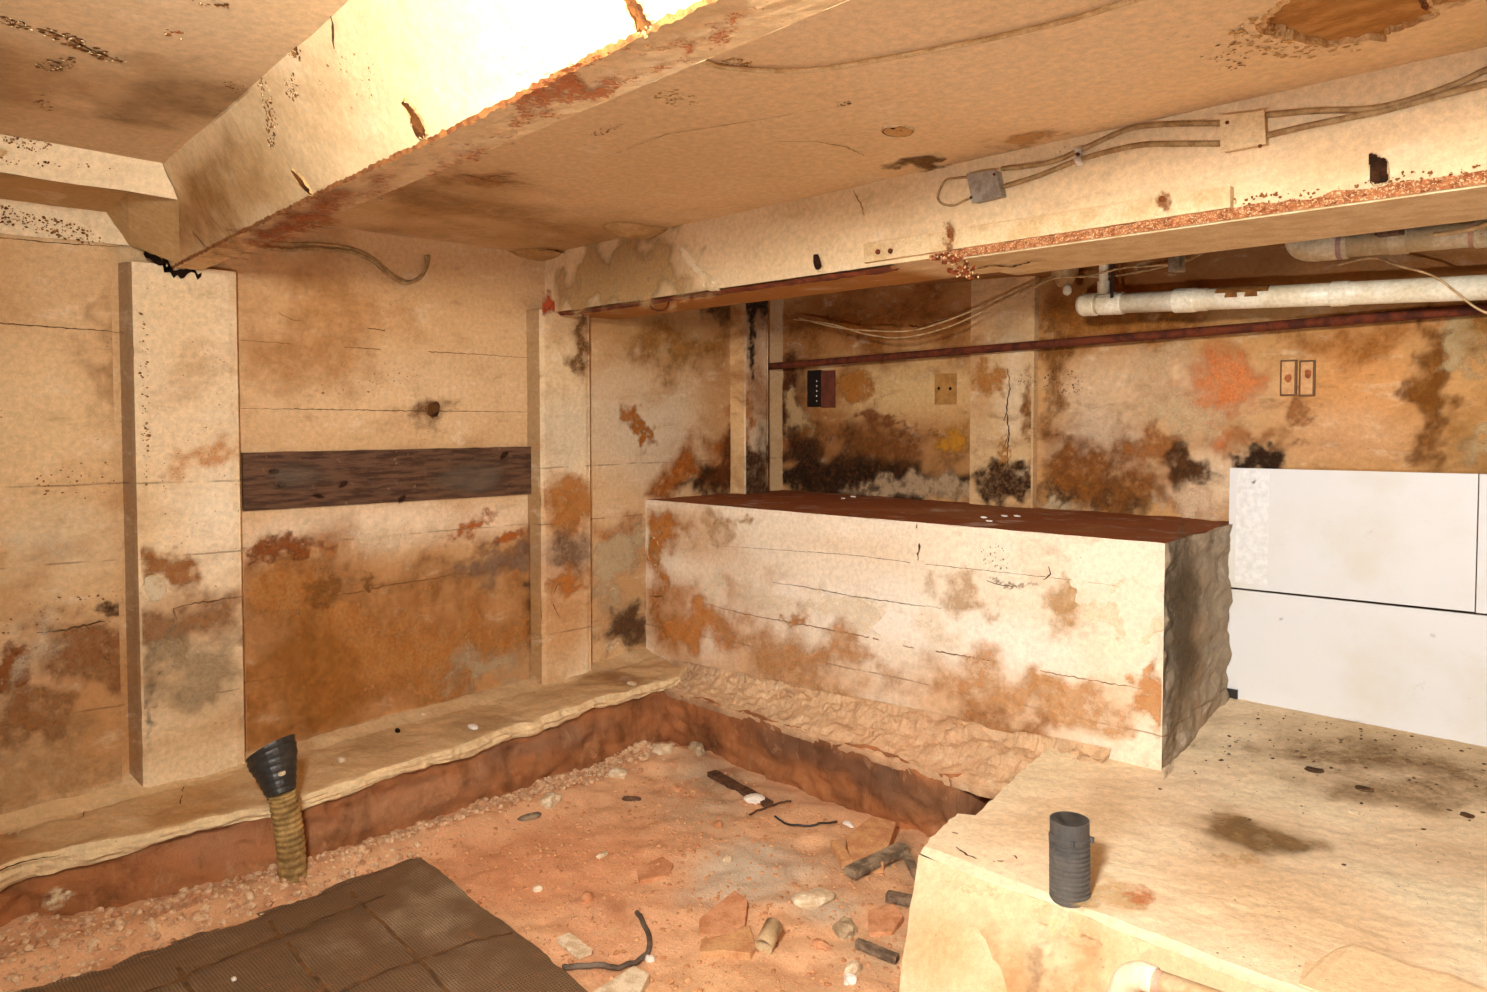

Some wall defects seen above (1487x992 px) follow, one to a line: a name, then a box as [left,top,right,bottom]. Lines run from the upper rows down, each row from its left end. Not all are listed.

spalling [1200,0,1440,70]
corrosion [171,0,764,269]
spalling [1234,152,1480,204]
spalling [931,251,979,280]
damp [641,284,941,404]
damp [414,401,440,419]
damp [1287,395,1311,425]
damp [691,270,1284,748]
damp [141,475,880,743]
damp [0,601,121,813]
damp [1285,741,1485,811]
damp [1210,813,1324,862]